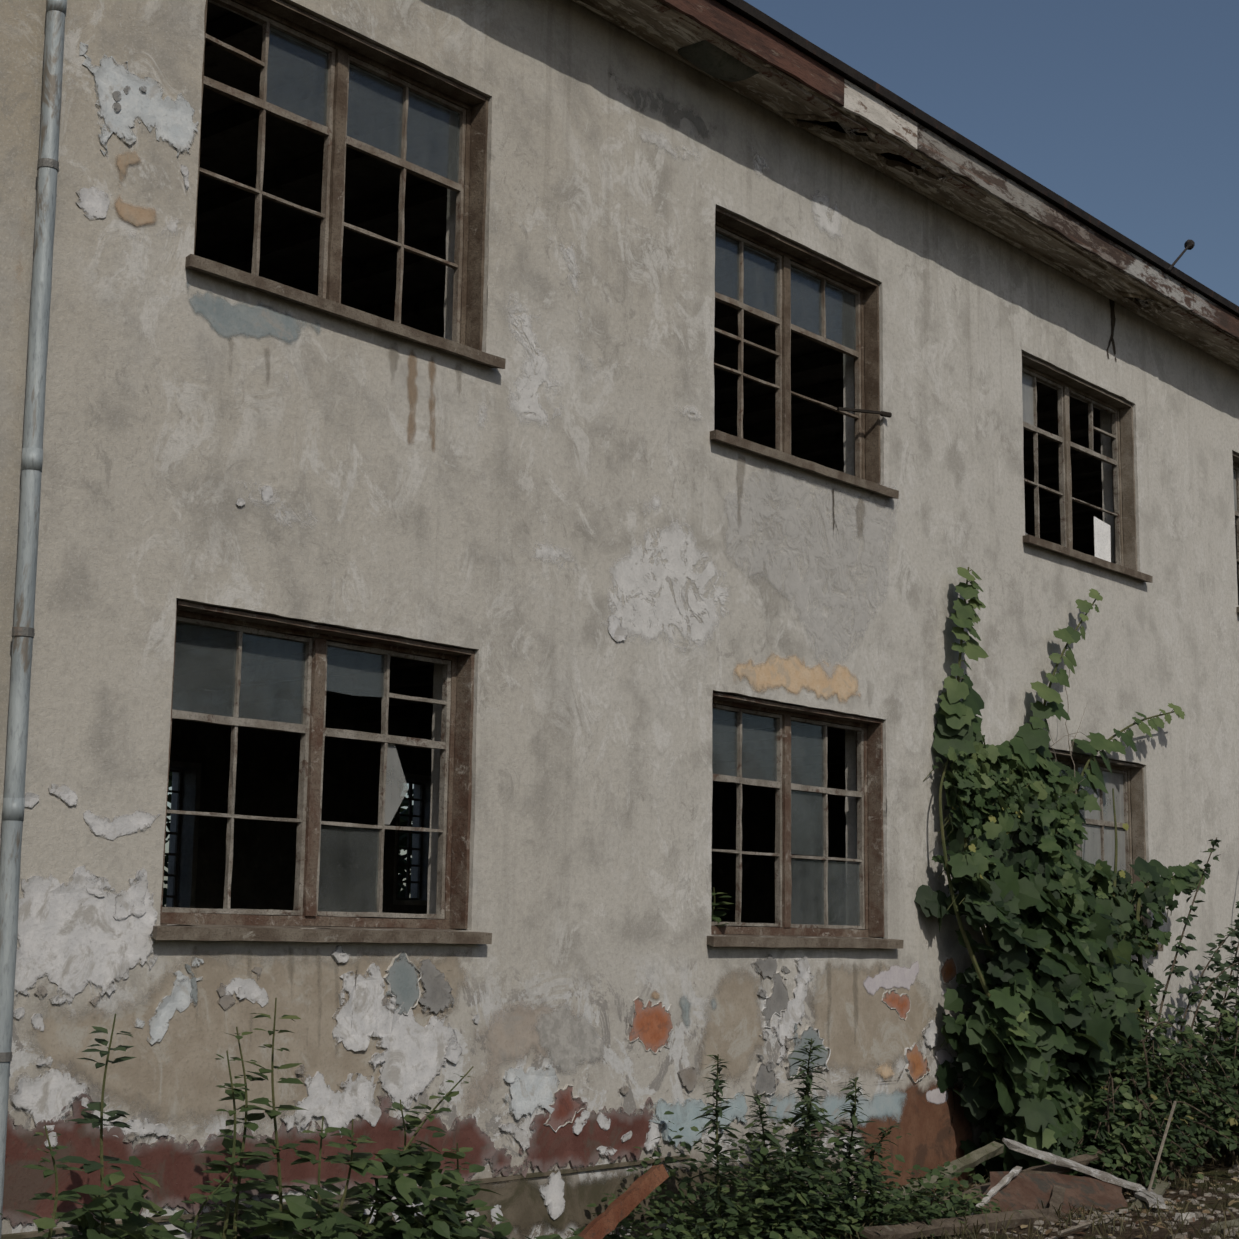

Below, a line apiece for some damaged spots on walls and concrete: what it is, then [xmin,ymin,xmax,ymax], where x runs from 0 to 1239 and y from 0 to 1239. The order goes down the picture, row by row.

peeling [79,42,199,188]
peeling [629,89,708,158]
peeling [75,186,178,231]
peeling [812,195,842,236]
leakage [187,284,320,342]
peeling [607,522,728,645]
peeling [726,469,897,701]
peeling [25,784,160,840]
peeling [2,866,981,1239]